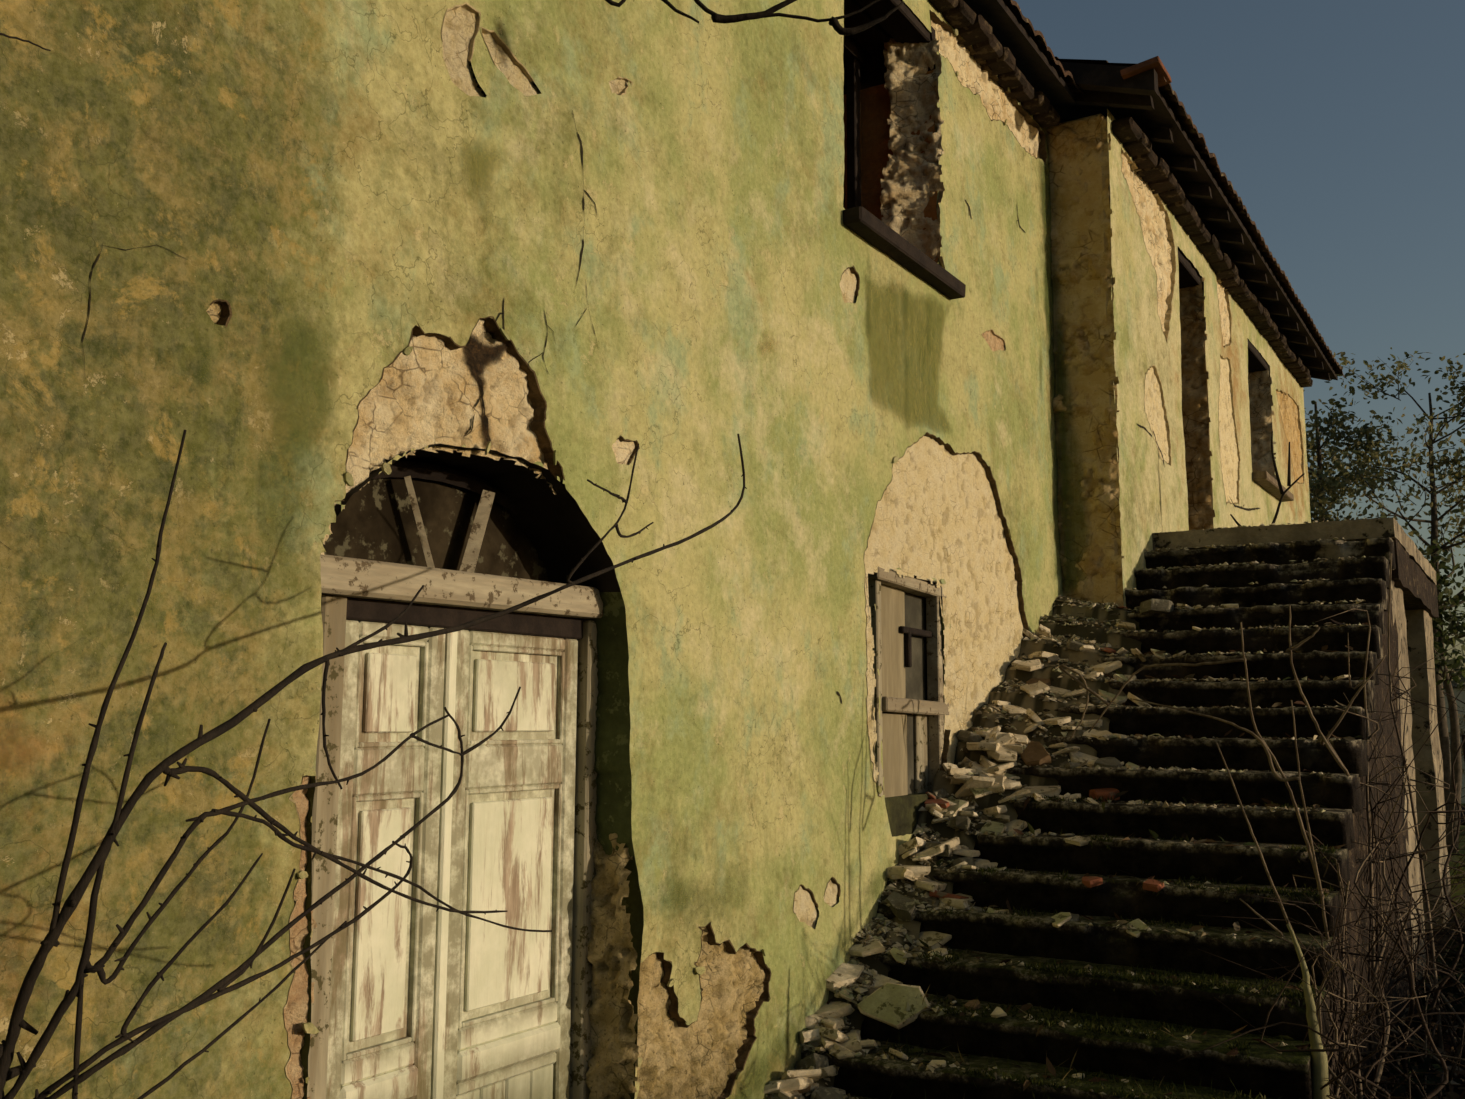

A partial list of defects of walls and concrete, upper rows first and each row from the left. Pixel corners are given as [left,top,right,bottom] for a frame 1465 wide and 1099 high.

flaking render [441,2,540,97]
flaking render [609,76,633,95]
flaking render [840,265,860,303]
flaking render [880,10,1305,607]
flaking render [334,316,565,509]
flaking render [612,435,640,465]
flaking render [864,432,1029,797]
flaking render [793,877,841,929]
flaking render [585,833,772,1099]